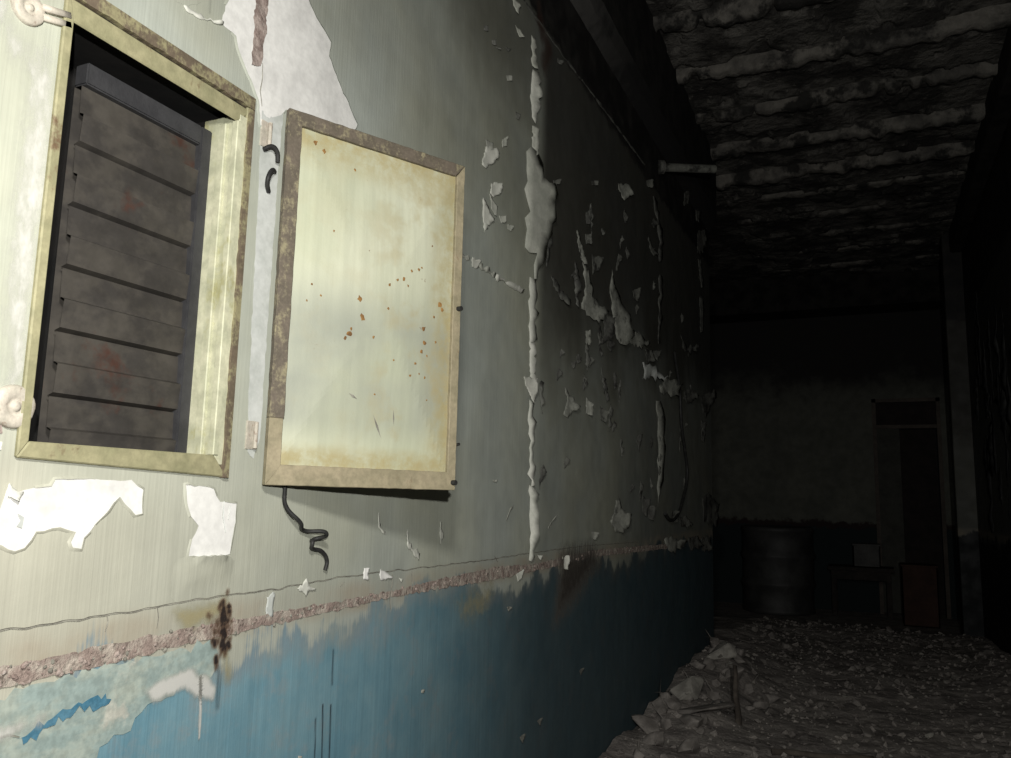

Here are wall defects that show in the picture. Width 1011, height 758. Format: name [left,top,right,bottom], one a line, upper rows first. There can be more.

peeling [0,0,717,758]
crack [0,542,632,632]
rust [180,590,233,675]